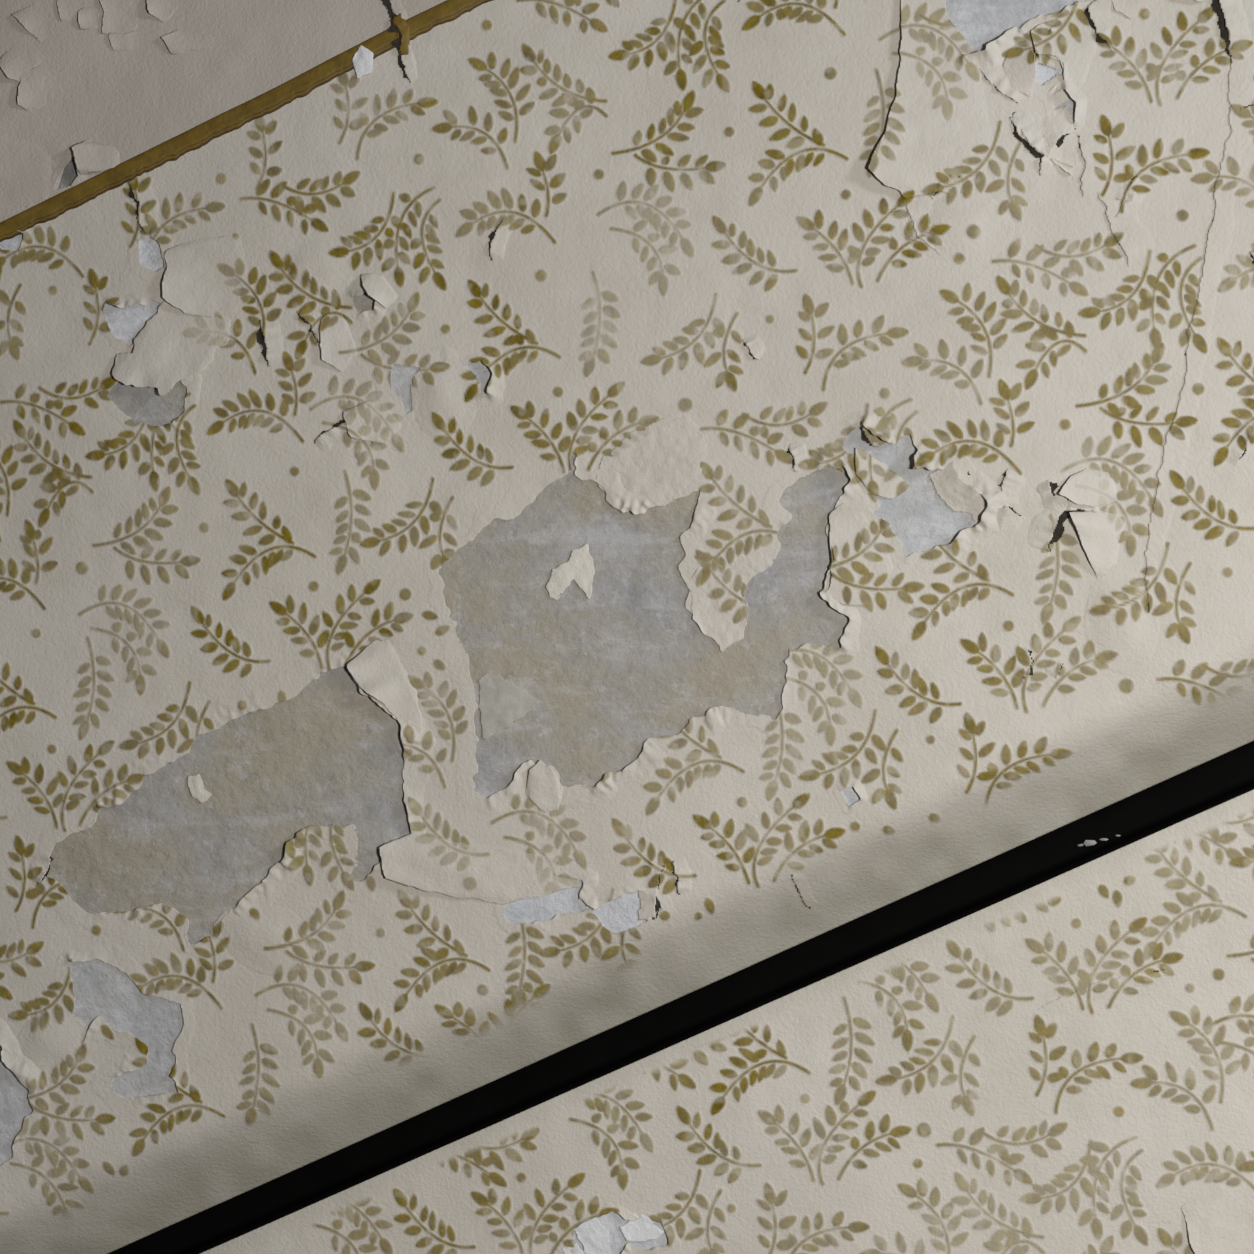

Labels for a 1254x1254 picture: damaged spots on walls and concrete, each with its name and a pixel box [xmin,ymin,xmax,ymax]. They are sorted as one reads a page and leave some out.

peeling [0,136,120,218]
peeling [868,0,1098,199]
crack [979,64,1155,267]
crack [1036,0,1133,70]
peeling [91,223,254,439]
peeling [320,273,398,372]
crack [1144,0,1254,625]
peeling [422,409,1009,815]
peeling [1059,468,1124,579]
peeling [27,639,675,1117]
peeling [554,1202,681,1254]
peeling [1181,1164,1254,1254]